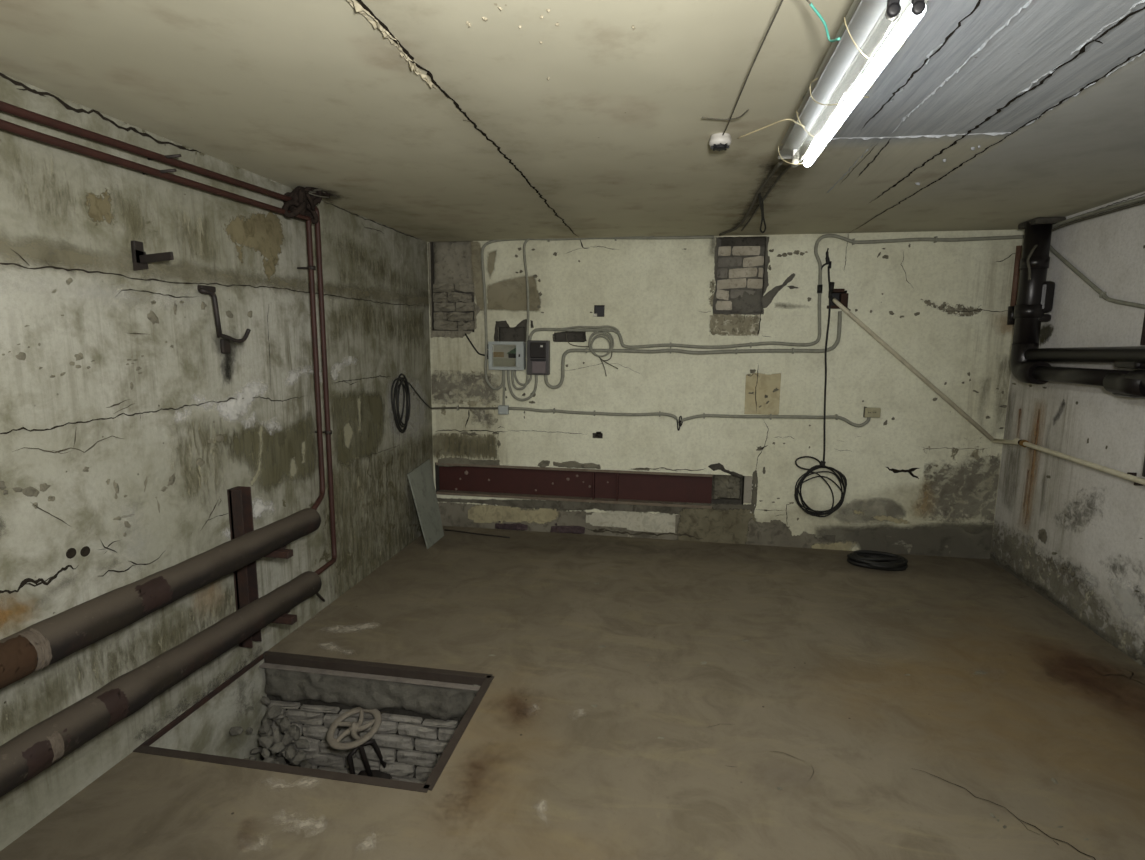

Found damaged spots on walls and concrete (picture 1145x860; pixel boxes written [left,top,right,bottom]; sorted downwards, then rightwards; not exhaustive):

crack [0,73,199,152]
crack [357,0,619,254]
crack [322,200,422,240]
peeling [709,237,808,336]
crack [0,249,419,454]
water stain [289,356,355,384]
crack [0,540,165,594]
water stain [178,382,318,518]
water stain [325,383,497,596]
peeling [438,502,680,540]
water stain [816,500,1145,668]
crack [911,768,1096,860]